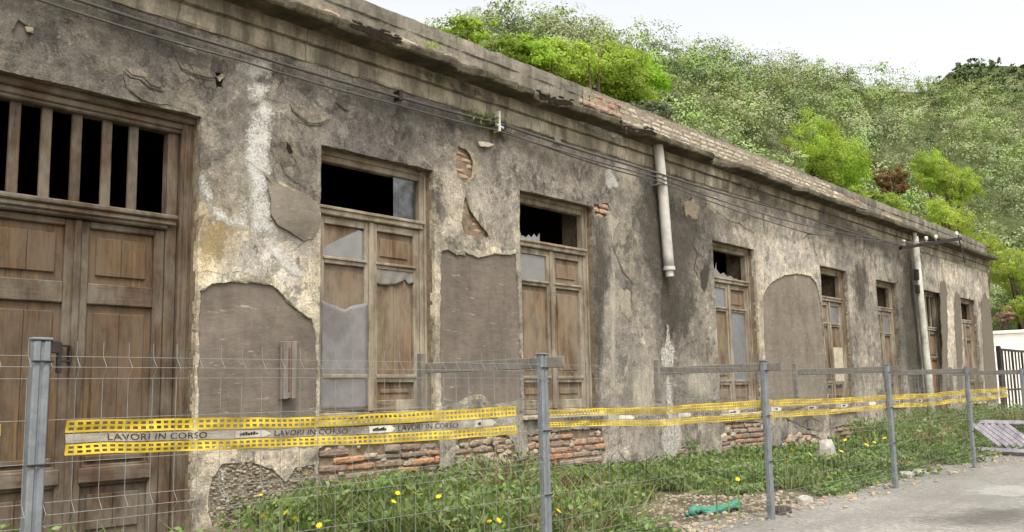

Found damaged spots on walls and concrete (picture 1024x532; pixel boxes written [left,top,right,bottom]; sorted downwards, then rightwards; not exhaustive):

crack [123,46,217,103]
spalling [455,141,494,183]
spalling [591,203,610,217]
damp [605,166,618,189]
flaking render [684,198,700,220]
spalling [535,88,867,210]
flaking render [193,272,440,528]
flaking render [439,196,521,407]
damp [595,186,699,461]
flaking render [763,268,863,447]